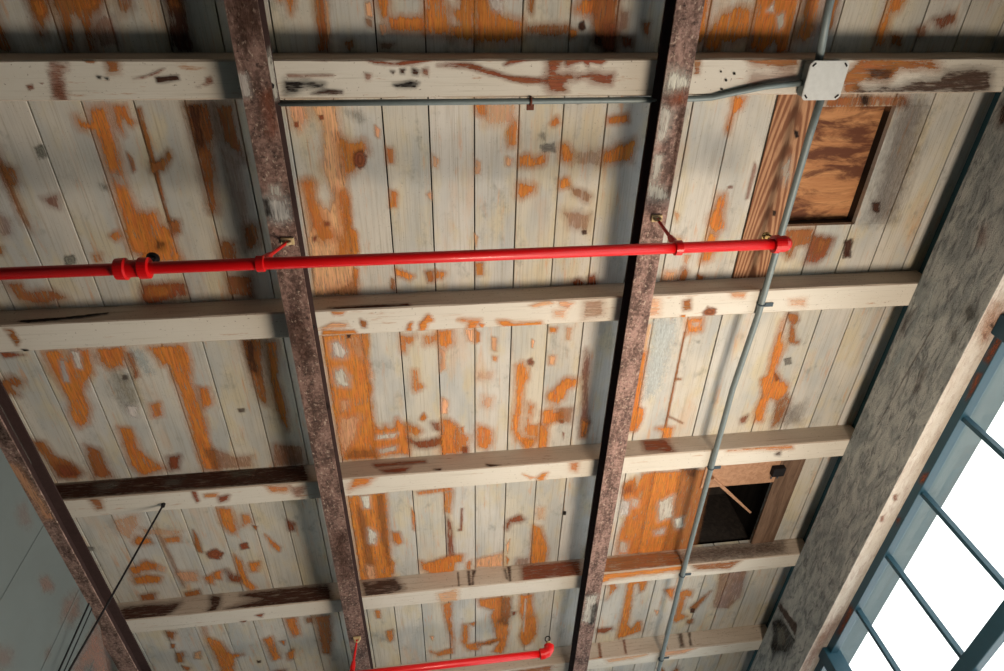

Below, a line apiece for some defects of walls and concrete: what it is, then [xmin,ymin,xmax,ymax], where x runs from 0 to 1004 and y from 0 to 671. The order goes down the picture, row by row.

peeling [445,0,633,92]
peeling [826,60,990,108]
peeling [285,82,367,296]
rust [668,91,685,194]
peeling [33,339,309,534]
peeling [322,304,492,596]
peeling [511,350,590,448]
peeling [643,299,702,452]
peeling [120,556,330,620]
peeling [431,589,537,656]
peeling [506,515,581,580]
peeling [589,469,739,638]